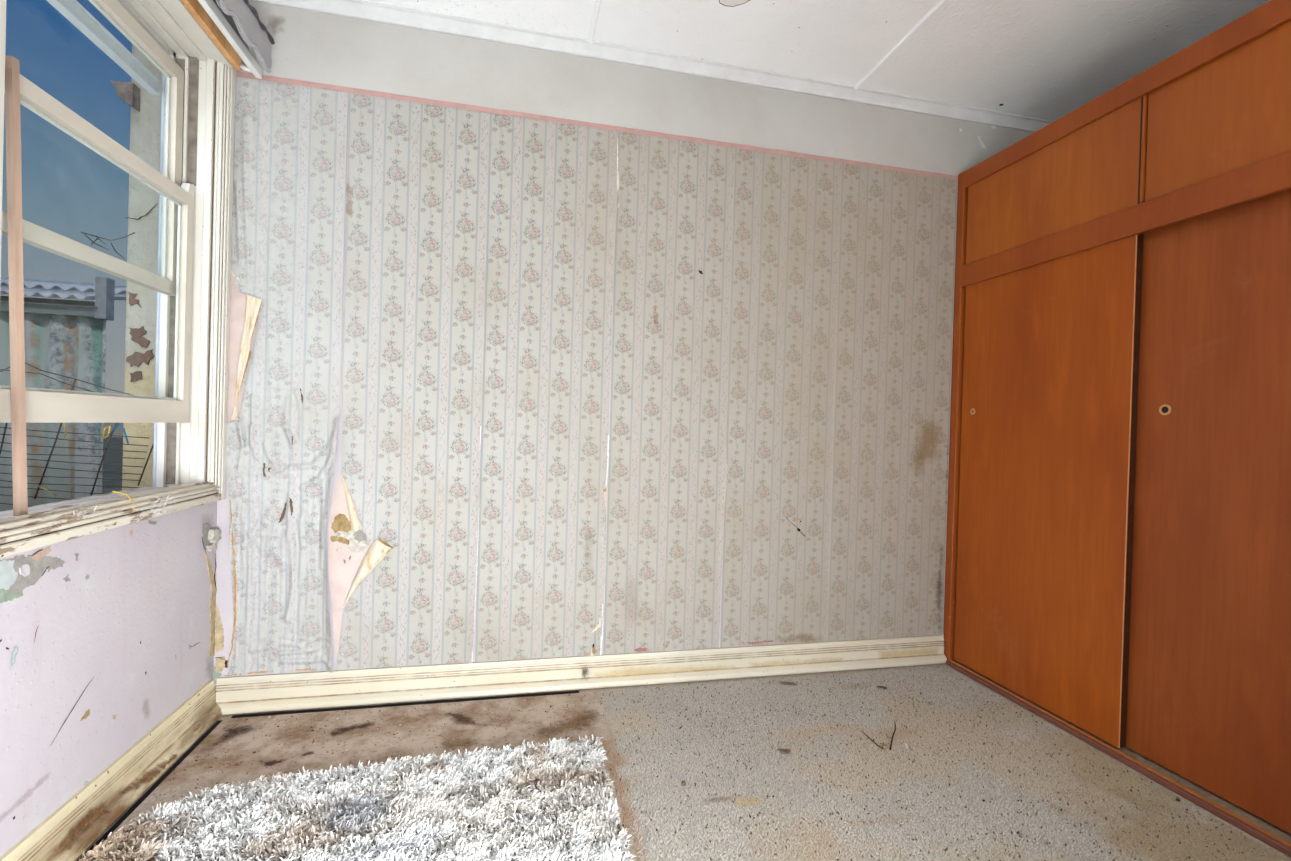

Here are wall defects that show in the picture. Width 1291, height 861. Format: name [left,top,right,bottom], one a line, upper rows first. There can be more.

peeling [227,271,262,423]
peeling [0,547,89,603]
flaking render [328,474,373,664]